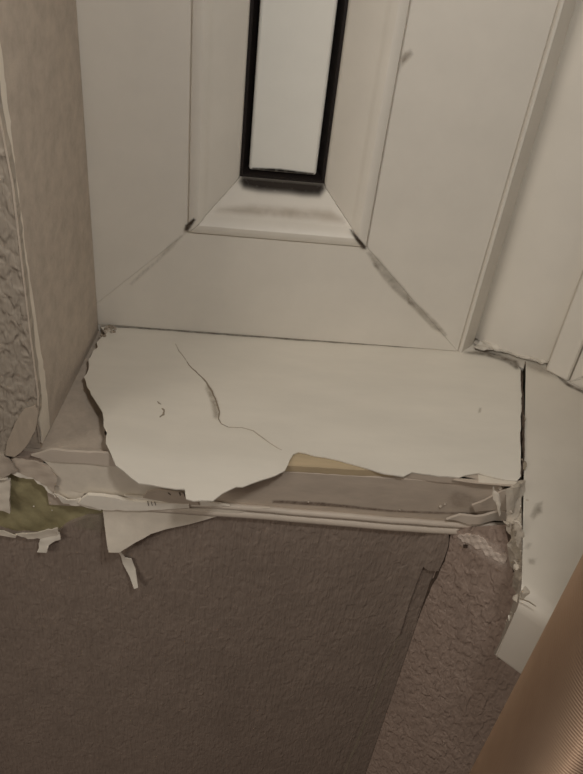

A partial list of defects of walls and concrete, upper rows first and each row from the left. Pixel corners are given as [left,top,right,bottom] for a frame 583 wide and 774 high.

crack [175,344,281,450]
crack [520,370,528,476]
flaking render [0,453,103,553]
spalling [453,474,530,660]